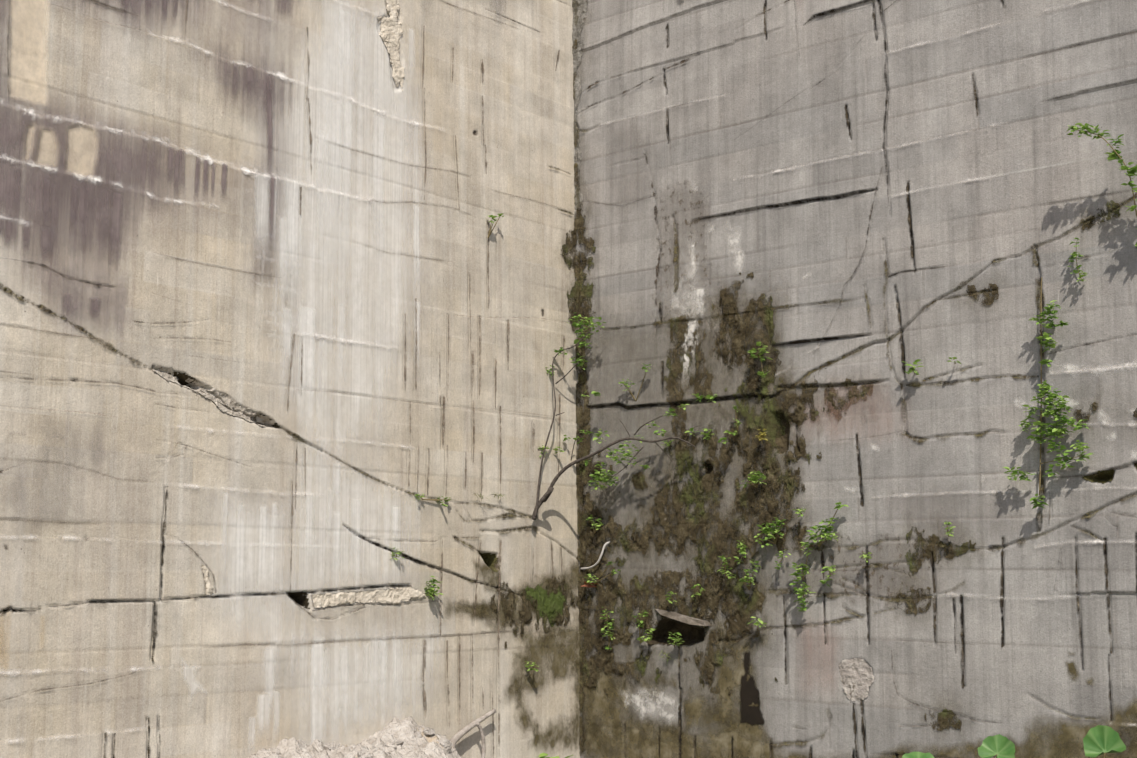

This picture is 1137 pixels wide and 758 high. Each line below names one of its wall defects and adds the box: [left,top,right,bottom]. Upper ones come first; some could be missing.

peeling [378,0,405,91]
water stain [0,109,227,255]
water stain [205,5,419,442]
crack [0,283,173,407]
crack [549,0,1046,733]
crack [271,425,306,443]
water stain [595,190,777,740]
spalling [1082,469,1114,483]
crack [63,502,537,619]
spalling [287,587,426,609]
spalling [646,618,705,646]
water stain [801,537,917,603]